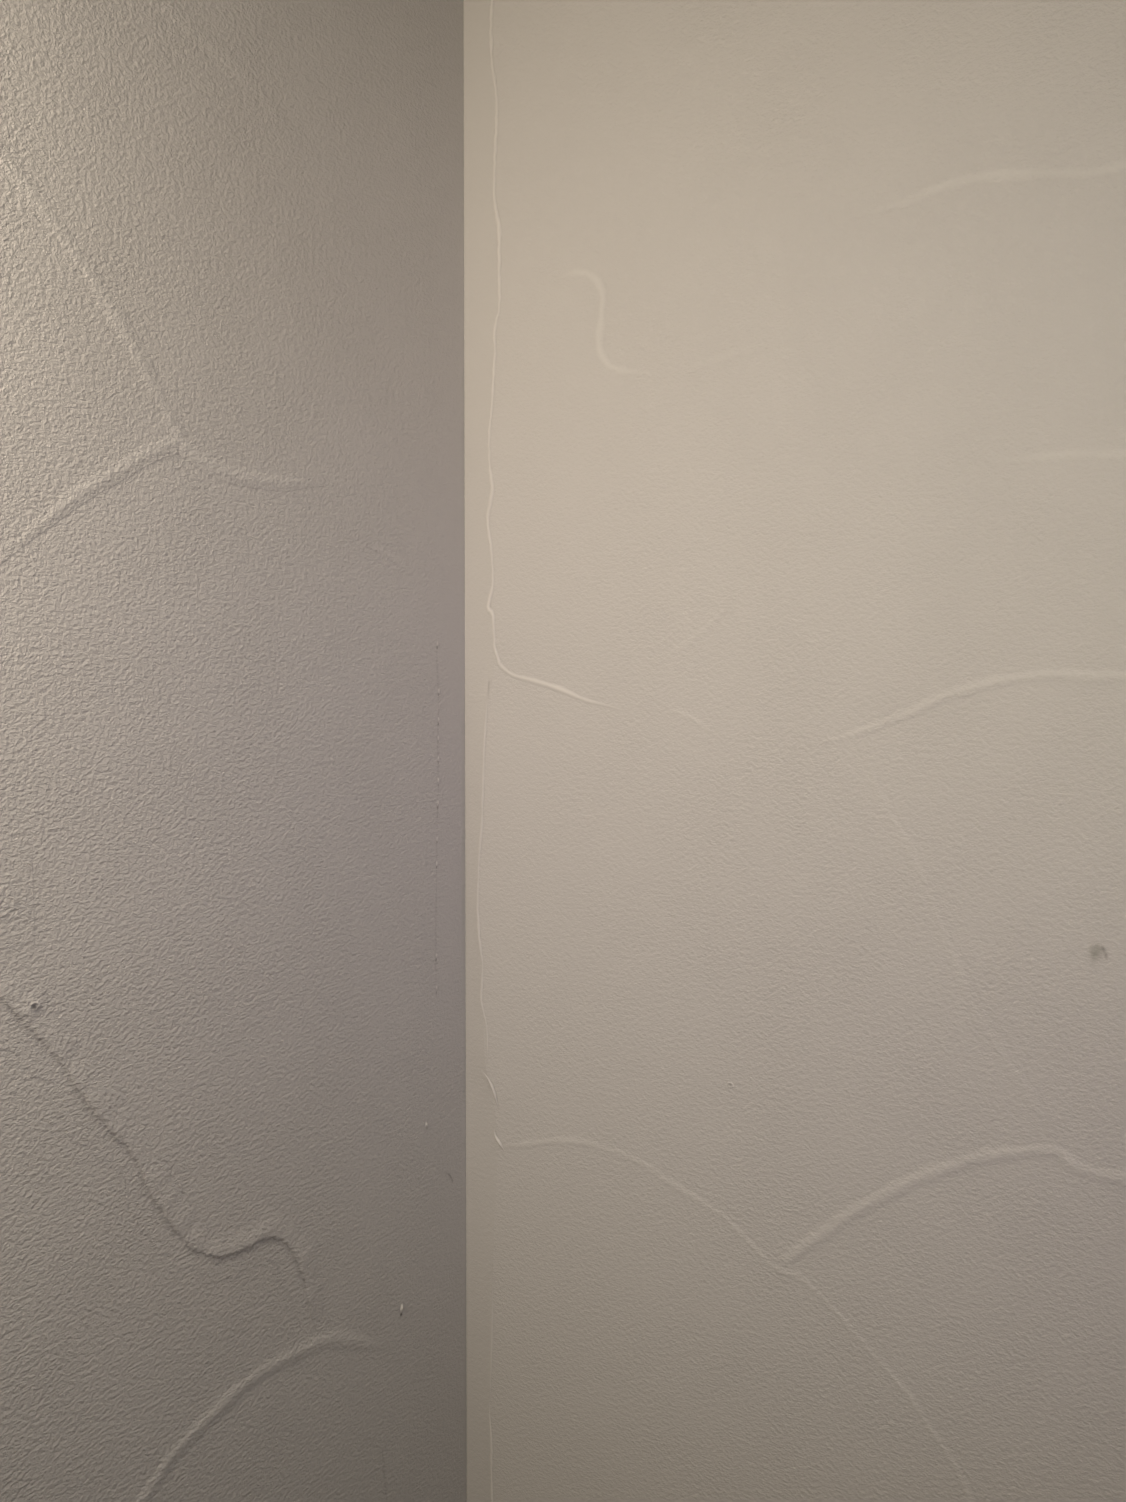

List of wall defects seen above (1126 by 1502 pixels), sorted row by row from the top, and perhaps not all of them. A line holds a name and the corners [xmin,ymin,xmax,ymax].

crack [486,0,721,740]